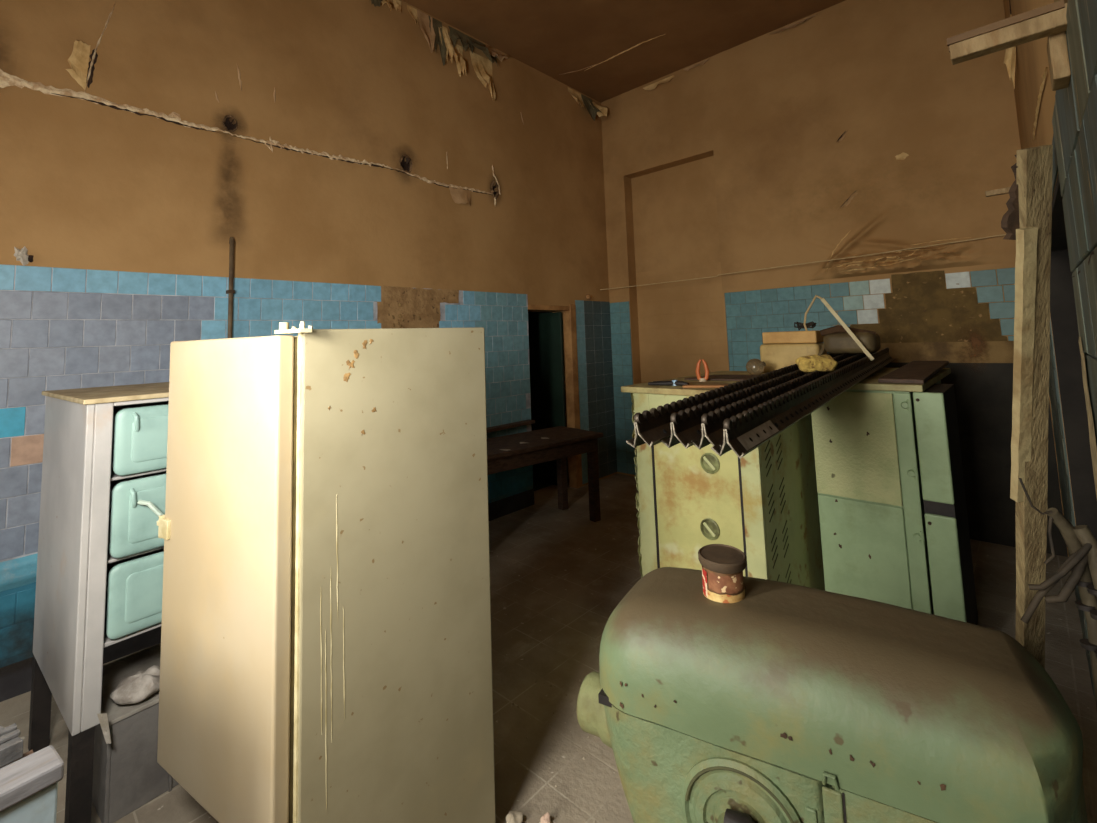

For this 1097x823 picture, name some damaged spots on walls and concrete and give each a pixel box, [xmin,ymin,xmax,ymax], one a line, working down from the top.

flaking render [0,69,27,88]
crack [0,4,492,206]
peeling [371,0,509,101]
peeling [568,87,608,121]
peeling [377,286,459,328]
peeling [850,270,1014,363]